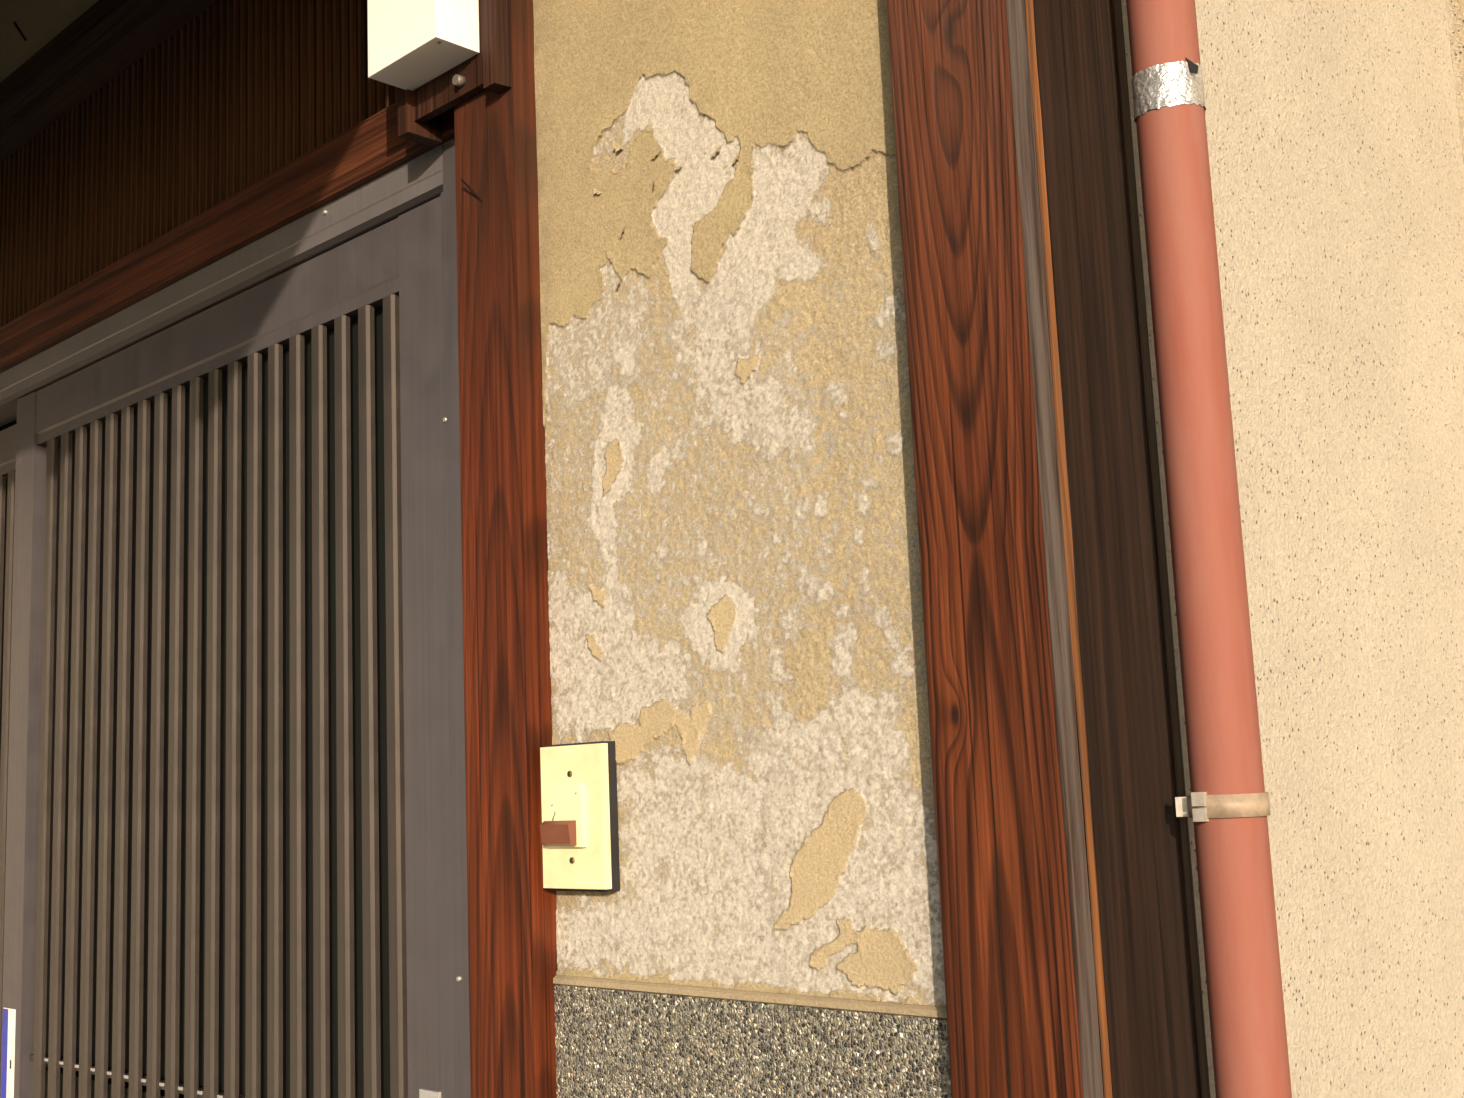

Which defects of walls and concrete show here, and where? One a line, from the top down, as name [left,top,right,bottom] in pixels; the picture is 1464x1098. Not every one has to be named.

flaking render [543,70,946,1007]